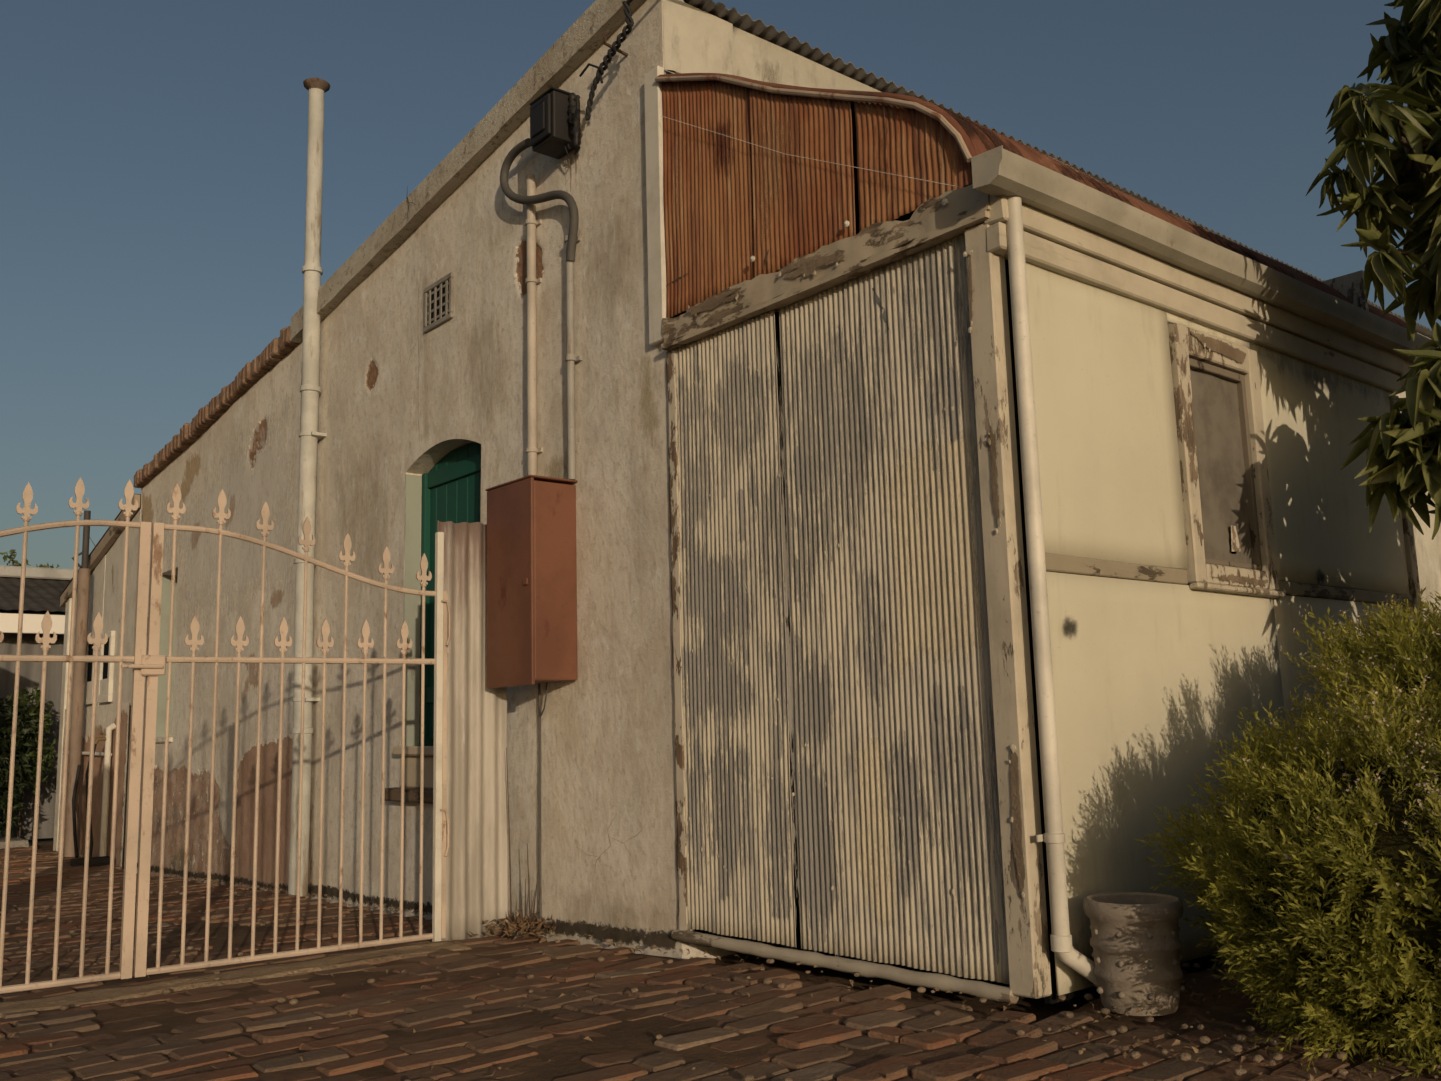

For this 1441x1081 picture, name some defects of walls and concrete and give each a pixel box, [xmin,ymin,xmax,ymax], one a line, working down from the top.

rust [711,119,733,177]
rust [758,111,792,238]
rust [936,105,1023,156]
rust [1047,155,1133,206]
flaking render [514,240,544,296]
peeling [1191,332,1246,364]
flaking render [247,418,267,470]
peeling [987,431,1002,534]
peeling [676,237,975,957]
peeling [1210,573,1268,587]
flaking render [150,734,293,893]
peeling [881,681,1025,977]